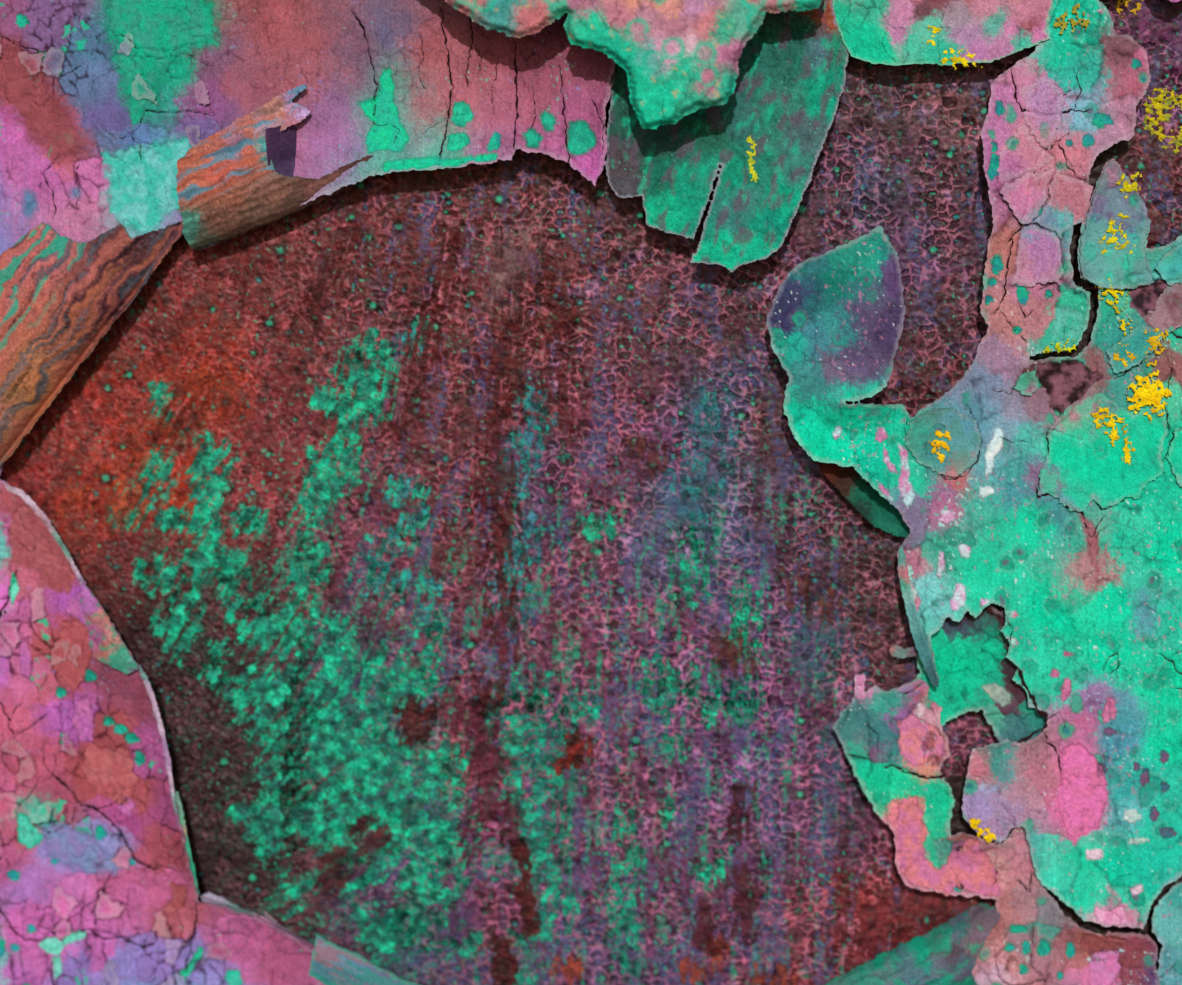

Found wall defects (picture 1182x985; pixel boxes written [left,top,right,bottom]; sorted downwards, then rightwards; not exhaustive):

crack [351,9,604,168]
peeling [445,0,822,131]
crack [994,68,1166,361]
peeling [987,0,1182,373]
corrosion [383,227,472,442]
peeling [814,461,910,537]
crack [940,404,1124,547]
peeling [1012,306,1182,570]
corrosion [392,247,583,985]
crack [0,698,197,985]
corrosion [315,812,394,899]
corrosion [820,866,996,973]